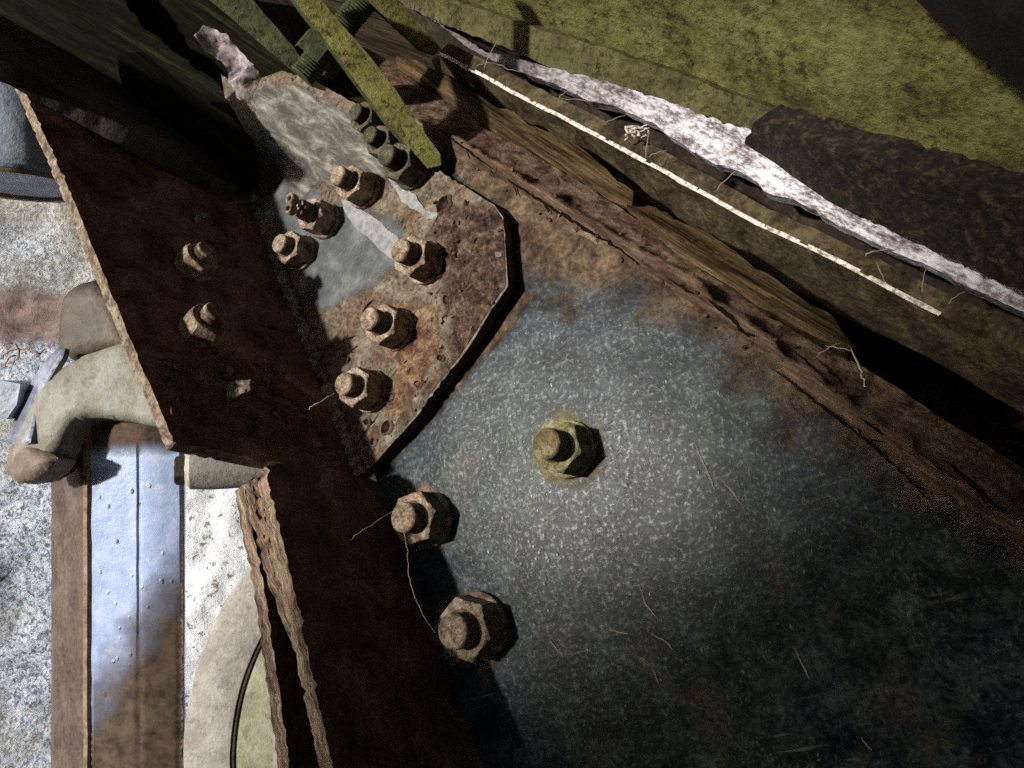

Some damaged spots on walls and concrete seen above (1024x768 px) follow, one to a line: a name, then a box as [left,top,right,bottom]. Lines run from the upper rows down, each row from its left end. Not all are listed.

rust [225,380,253,404]
rust [369,113,1024,567]